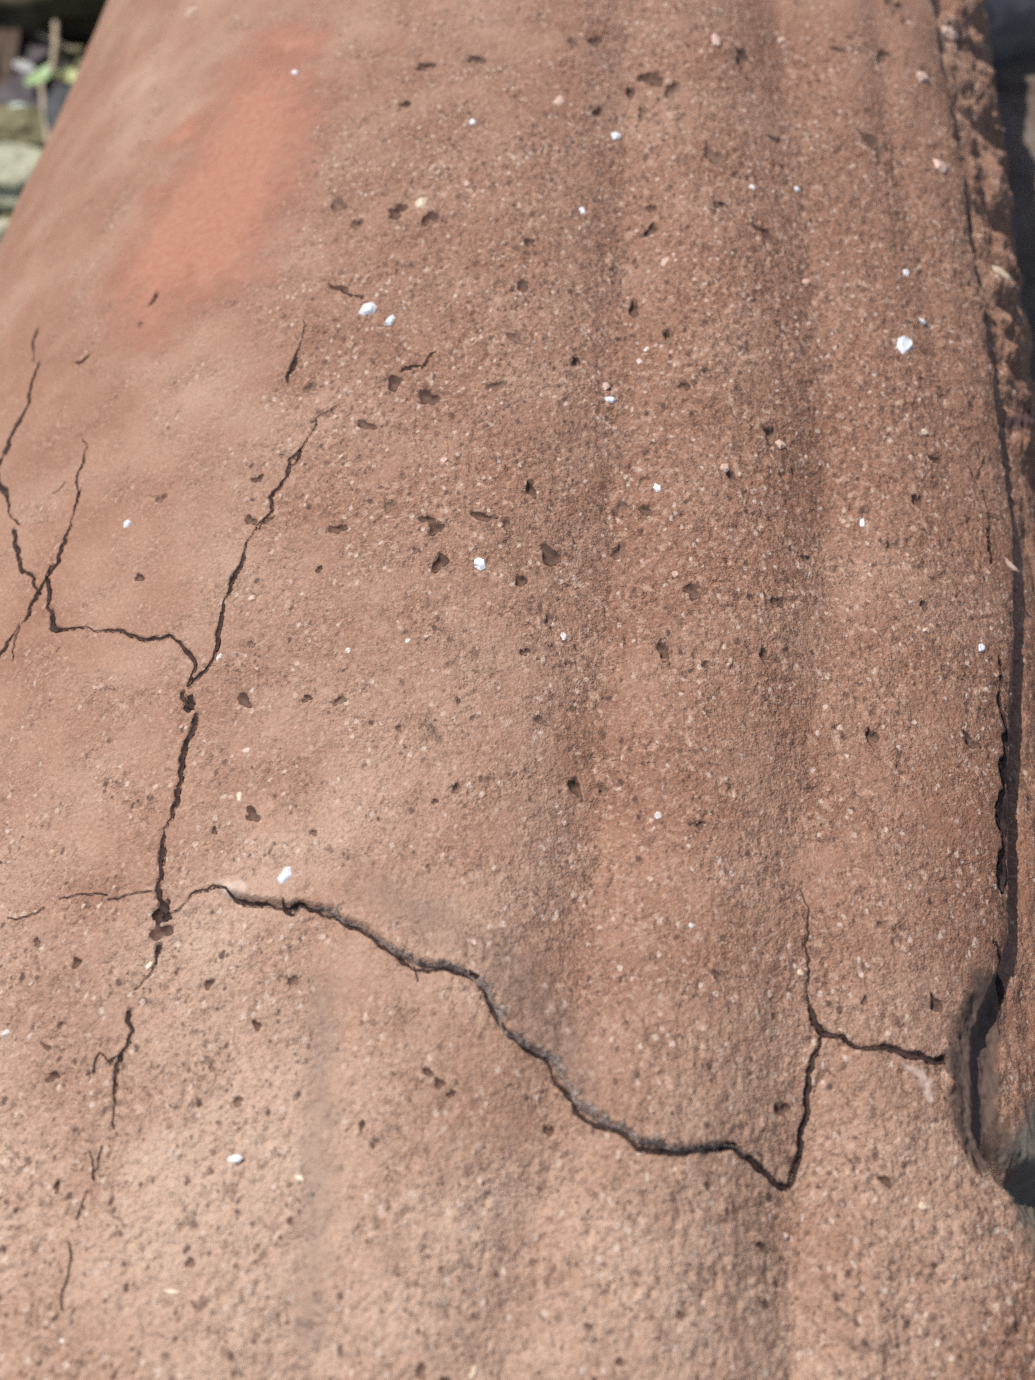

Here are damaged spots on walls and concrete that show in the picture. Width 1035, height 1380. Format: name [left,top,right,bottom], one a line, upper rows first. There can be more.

crack [285,319,305,382]
crack [968,456,992,563]
crack [0,330,945,1309]
crack [995,658,1008,892]
crack [994,940,1005,1035]
crack [973,1156,983,1177]